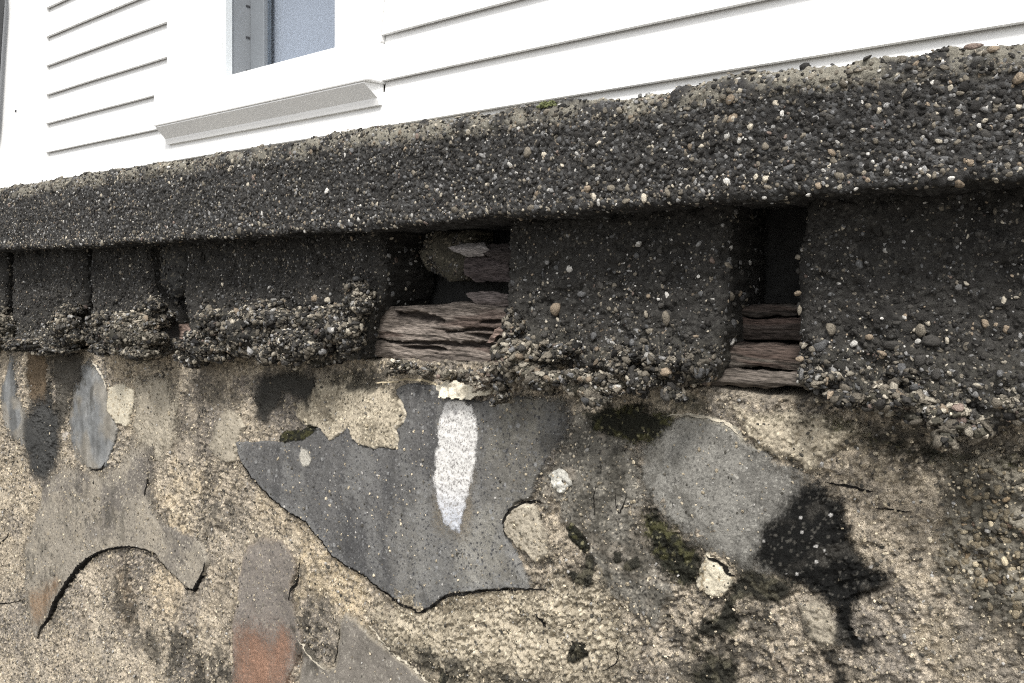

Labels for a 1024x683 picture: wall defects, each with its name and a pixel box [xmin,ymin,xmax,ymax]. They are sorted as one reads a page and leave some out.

leakage [23,354,83,481]
peeling [91,360,180,465]
leakage [253,372,316,423]
peeling [296,375,496,450]
spalling [548,468,572,493]
spalling [504,503,552,563]
leakage [753,482,892,683]